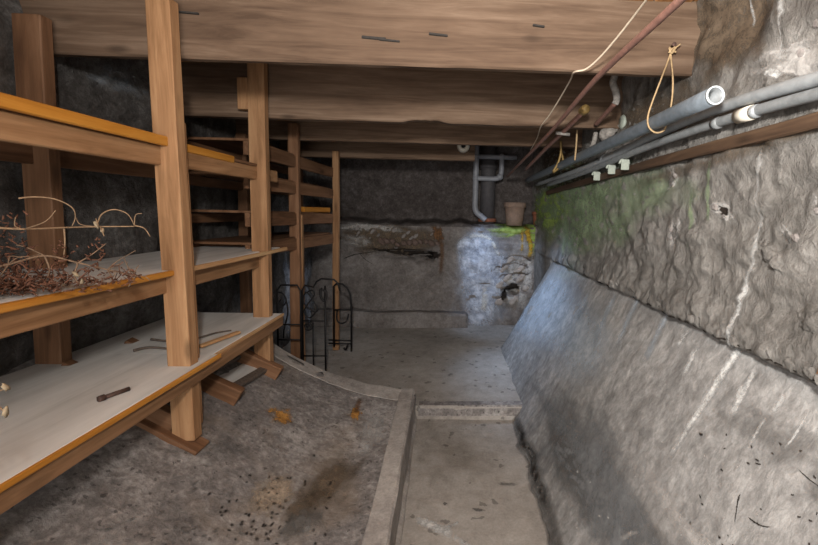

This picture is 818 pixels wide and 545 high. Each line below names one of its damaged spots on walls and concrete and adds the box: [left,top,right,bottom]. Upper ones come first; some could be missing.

leakage [621,82,687,128]
leakage [543,148,585,184]
peeling [505,253,533,305]
leakage [281,463,359,535]